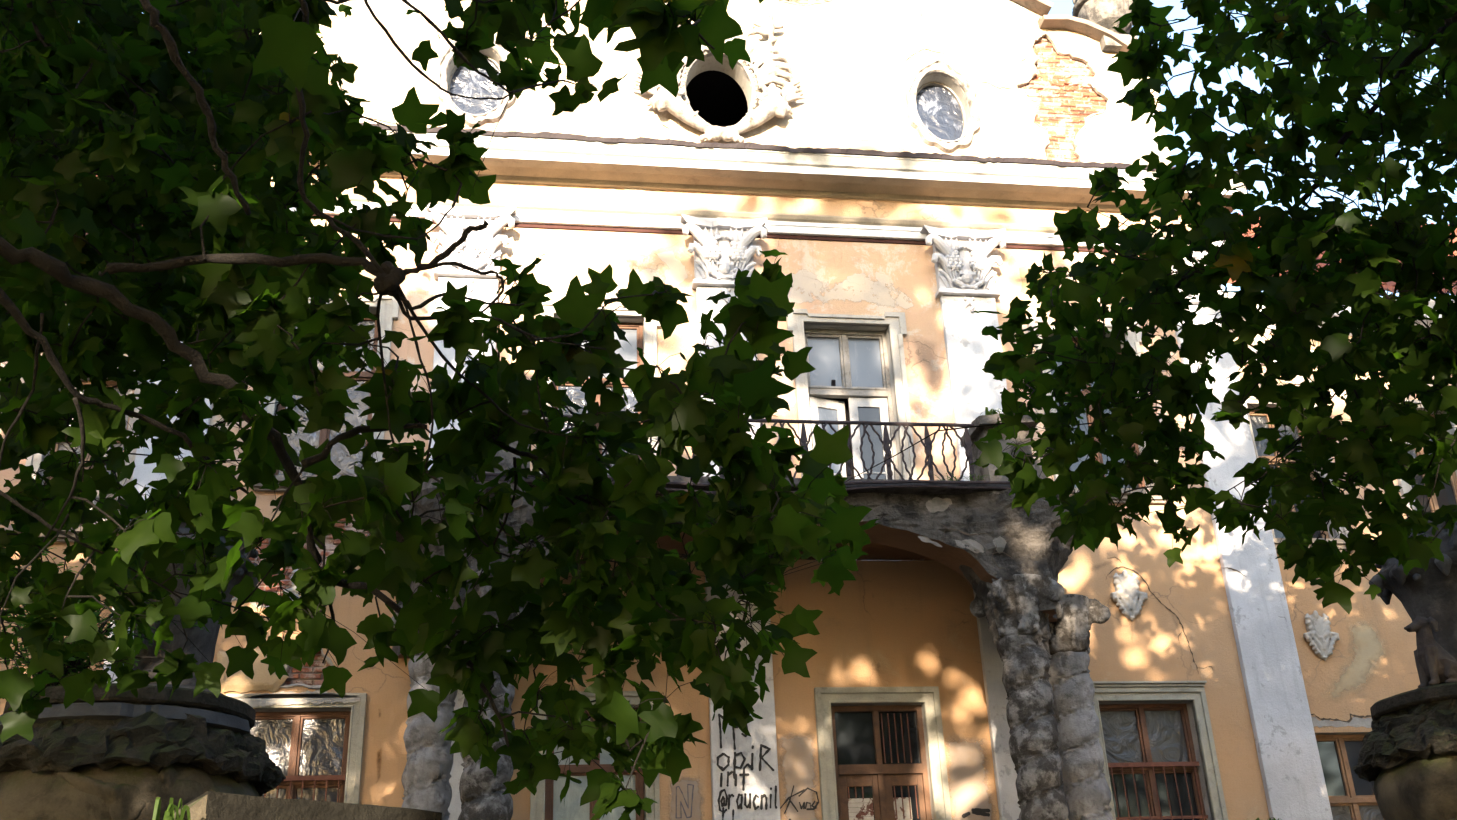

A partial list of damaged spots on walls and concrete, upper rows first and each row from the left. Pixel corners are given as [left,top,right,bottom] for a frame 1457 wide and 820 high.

spalling [943,0,1163,162]
crack [1106,557,1213,671]